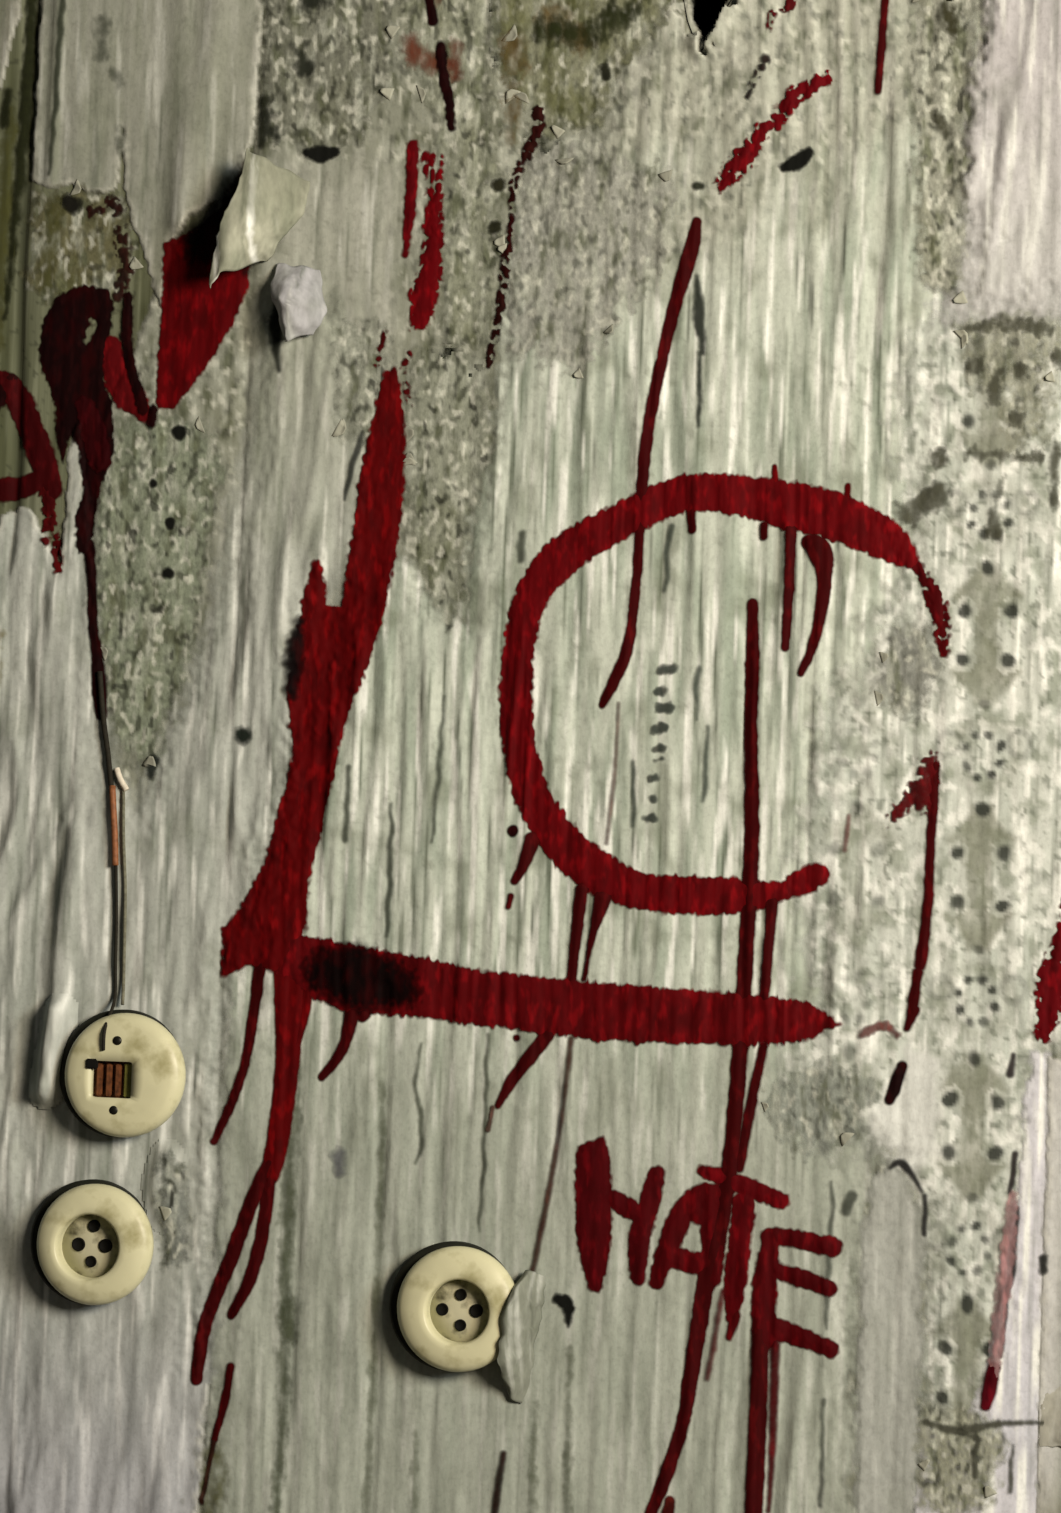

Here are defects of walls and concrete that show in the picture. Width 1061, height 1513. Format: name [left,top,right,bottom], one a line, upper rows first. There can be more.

peeling [257,0,684,631]
peeling [872,627,941,714]
peeling [761,1060,875,1154]
peeling [914,1403,1004,1513]